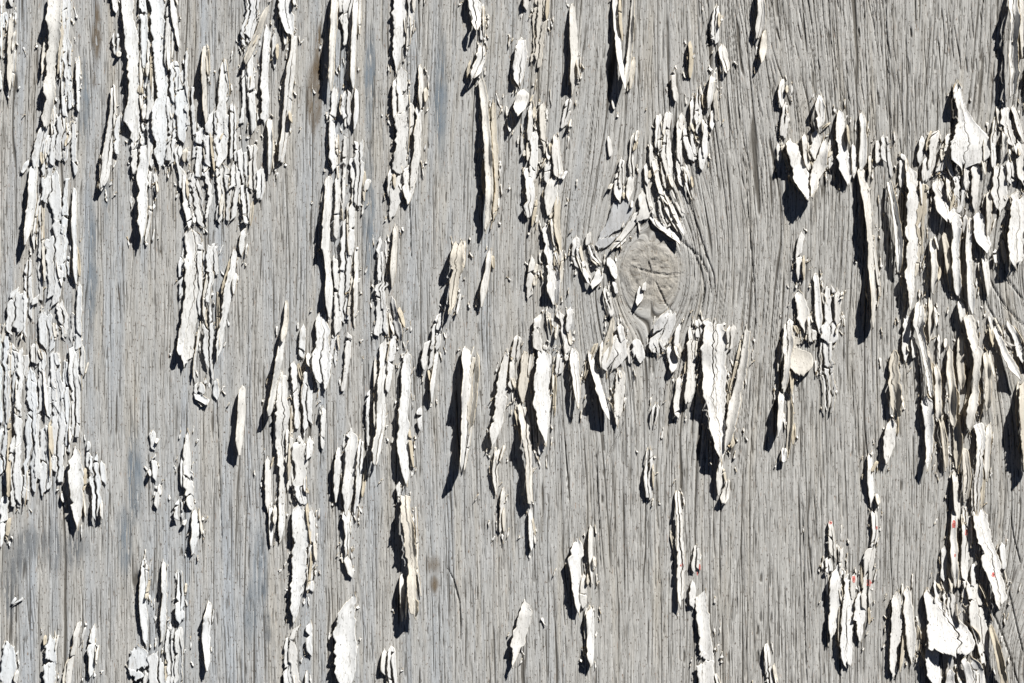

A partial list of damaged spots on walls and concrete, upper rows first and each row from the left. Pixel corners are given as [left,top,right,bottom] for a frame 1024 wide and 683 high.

peeling [0,0,107,548]
peeling [97,0,304,456]
peeling [254,0,755,683]
peeling [768,0,1024,683]
peeling [144,426,208,562]
peeling [0,640,20,683]
peeling [41,621,104,683]
peeling [125,549,214,683]
peeling [764,641,778,683]